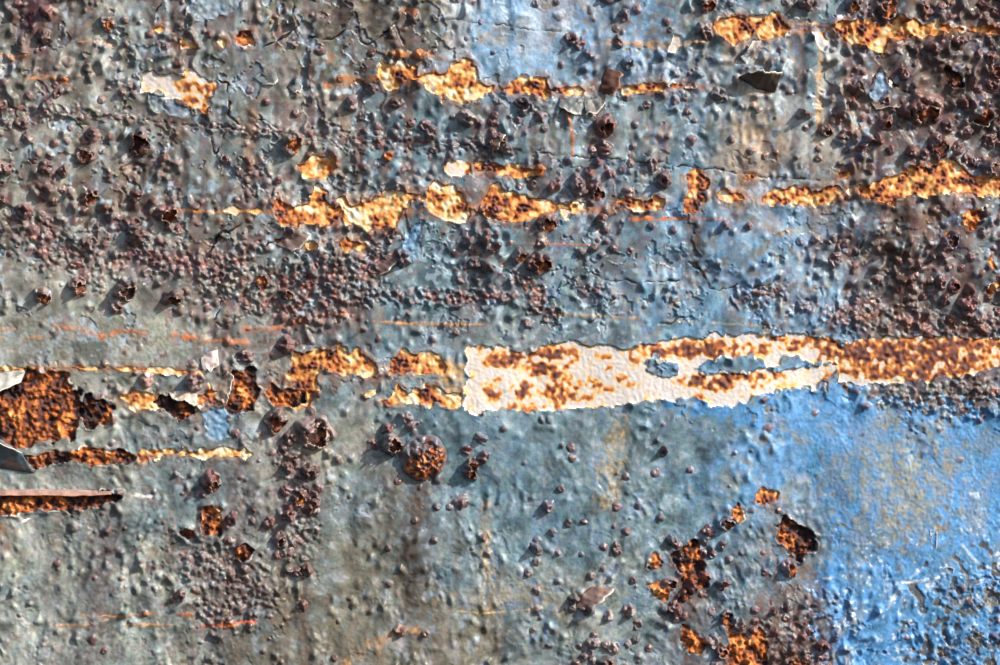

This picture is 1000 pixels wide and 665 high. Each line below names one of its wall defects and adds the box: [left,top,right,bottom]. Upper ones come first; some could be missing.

corrosion [397,5,420,18]
corrosion [77,38,118,50]
corrosion [383,48,414,59]
corrosion [1,97,489,160]
corrosion [551,188,689,223]
corrosion [818,184,863,210]
corrosion [99,359,295,425]
corrosion [315,359,390,400]
corrosion [434,352,468,394]
peeling [0,332,1000,473]
spalling [0,487,121,518]
corrosion [641,367,1000,665]